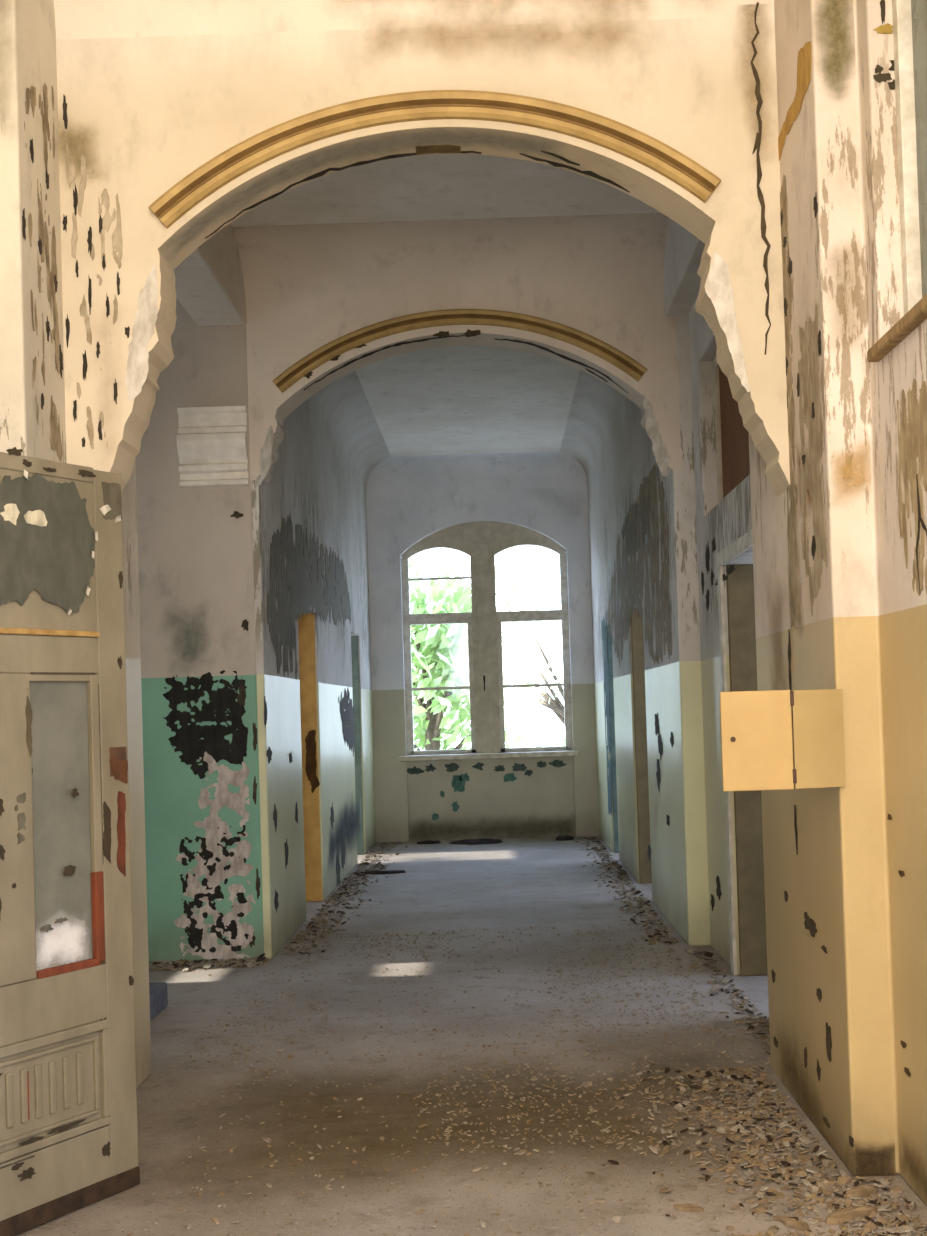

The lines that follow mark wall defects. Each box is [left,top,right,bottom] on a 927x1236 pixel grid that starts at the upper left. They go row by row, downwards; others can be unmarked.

water stain [821,0,851,84]
crack [750,2,771,355]
peeling [0,83,158,616]
peeling [780,174,828,629]
peeling [897,379,927,596]
peeling [267,515,351,680]
peeling [163,670,279,960]
peeling [289,730,320,793]
peeling [407,760,566,812]
spalling [804,912,827,954]
peeling [19,1119,86,1146]
spalling [804,1022,832,1081]